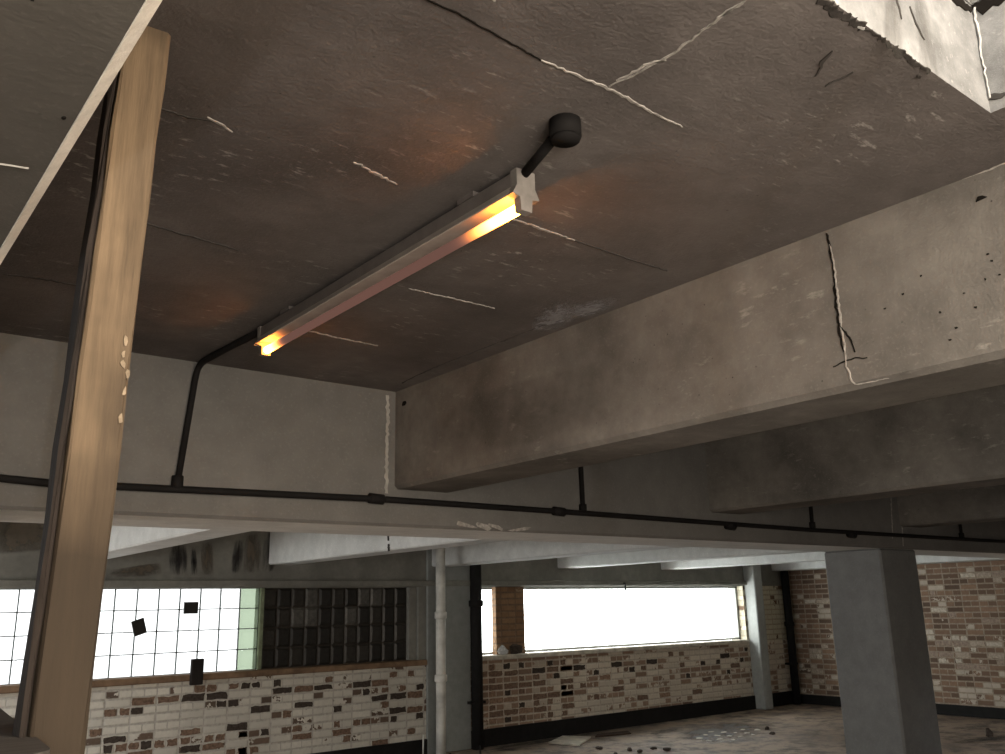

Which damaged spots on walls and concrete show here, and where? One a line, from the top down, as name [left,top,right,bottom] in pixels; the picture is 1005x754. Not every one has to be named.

crack [426,0,747,128]
crack [815,51,854,87]
spalling [816,0,931,79]
crack [896,0,925,40]
crack [952,0,1005,101]
crack [0,162,29,170]
crack [826,233,889,385]